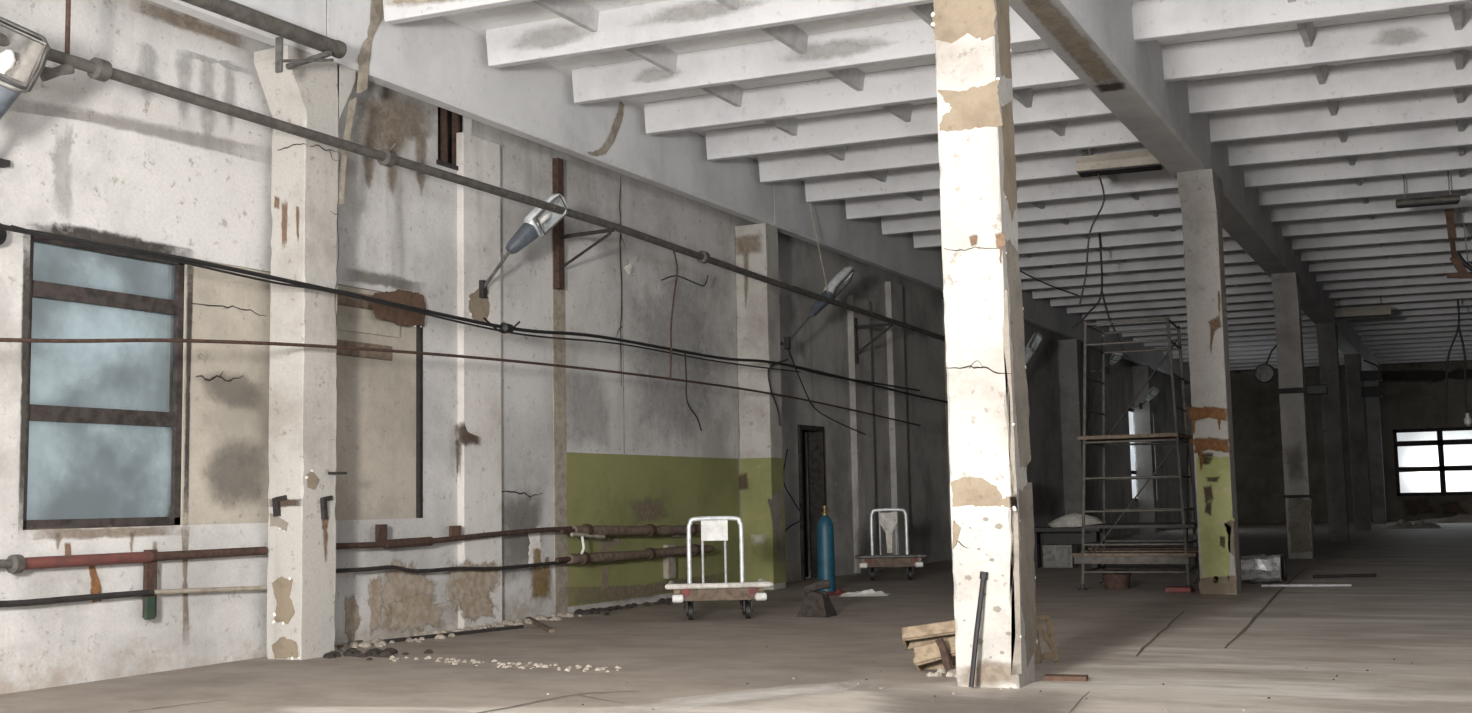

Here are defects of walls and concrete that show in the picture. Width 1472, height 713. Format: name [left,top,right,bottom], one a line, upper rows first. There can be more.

damp [364,94,425,190]
peeling [931,0,1017,221]
damp [212,451,257,500]
peeling [951,239,1038,676]
peeling [272,576,300,660]